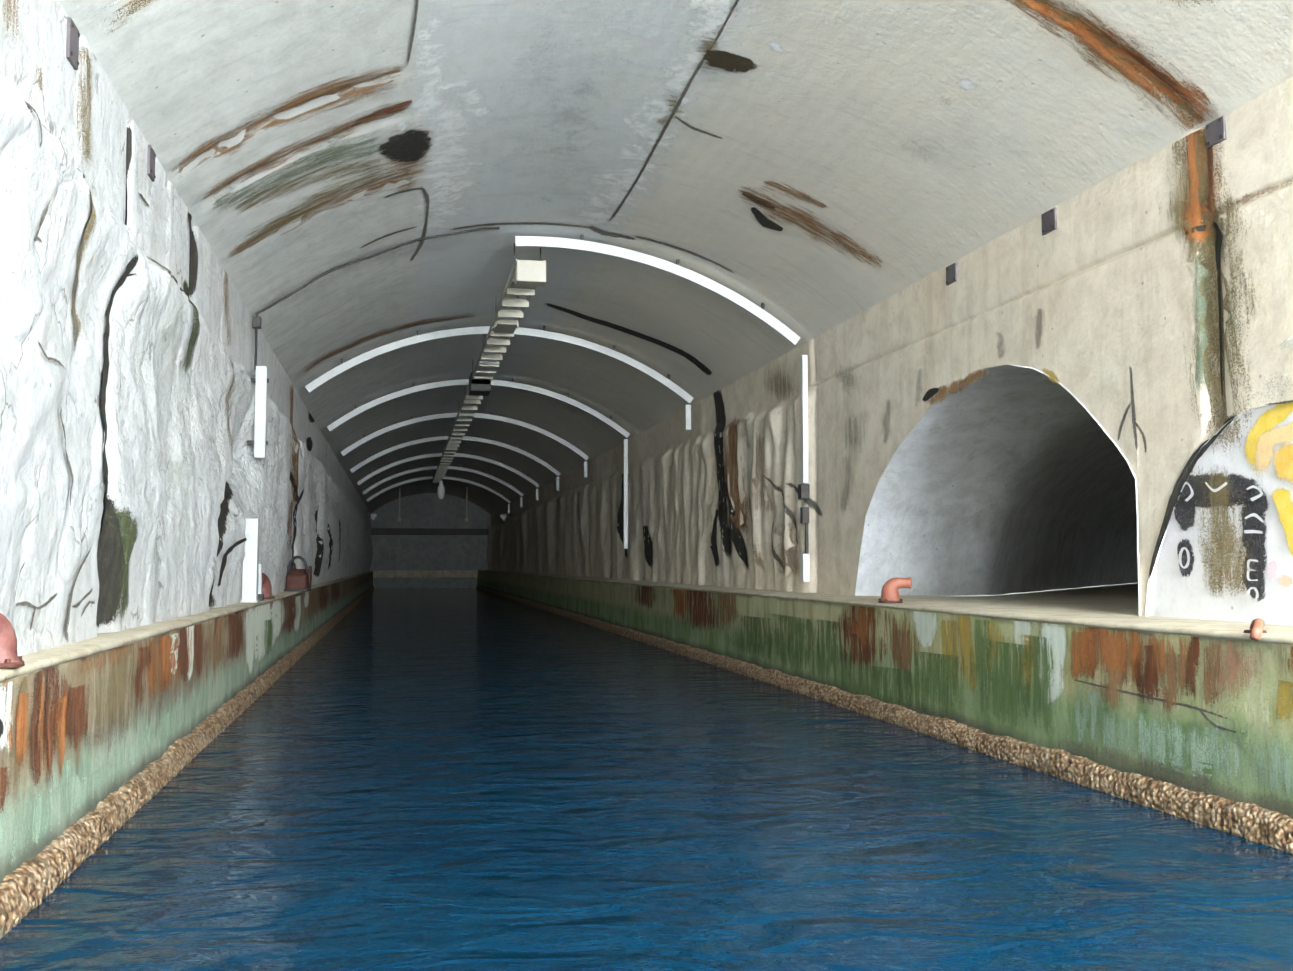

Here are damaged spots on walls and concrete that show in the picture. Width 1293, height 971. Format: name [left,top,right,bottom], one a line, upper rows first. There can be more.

spalling [376,120,435,180]
crack [361,0,739,273]
spalling [697,32,758,74]
rust [1006,0,1231,247]
water stain [170,0,744,450]
rust [738,180,883,270]
crack [546,303,823,573]
water stain [1176,190,1261,599]
rust [0,667,90,814]
rust [132,611,245,708]
rust [833,605,919,673]
rust [1063,627,1293,723]